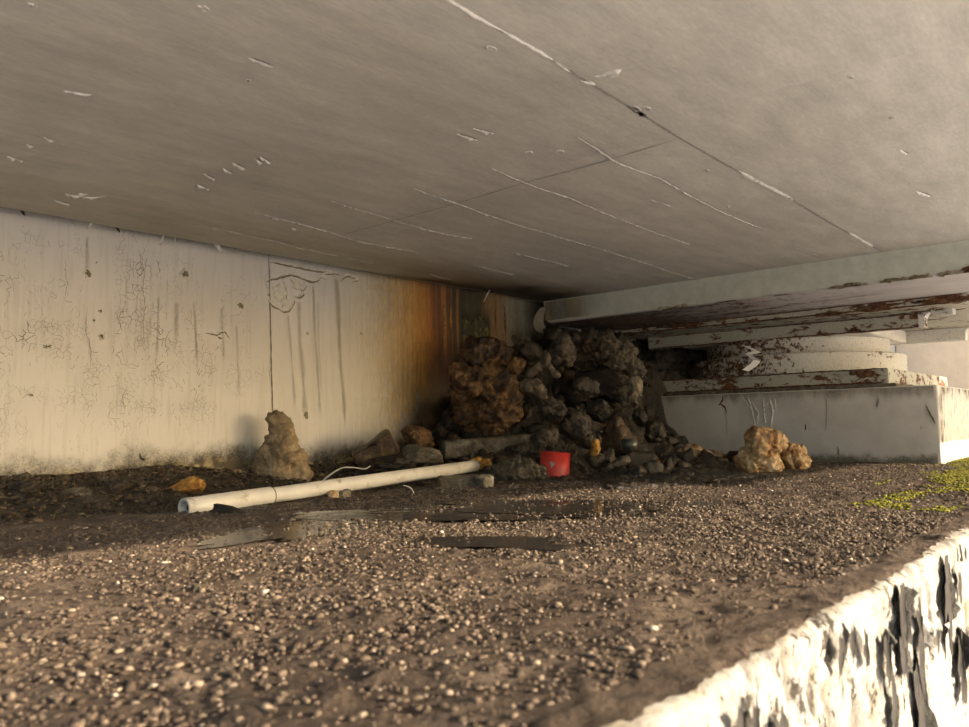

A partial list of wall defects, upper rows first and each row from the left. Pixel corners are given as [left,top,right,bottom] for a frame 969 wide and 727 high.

rust [378,274,969,444]